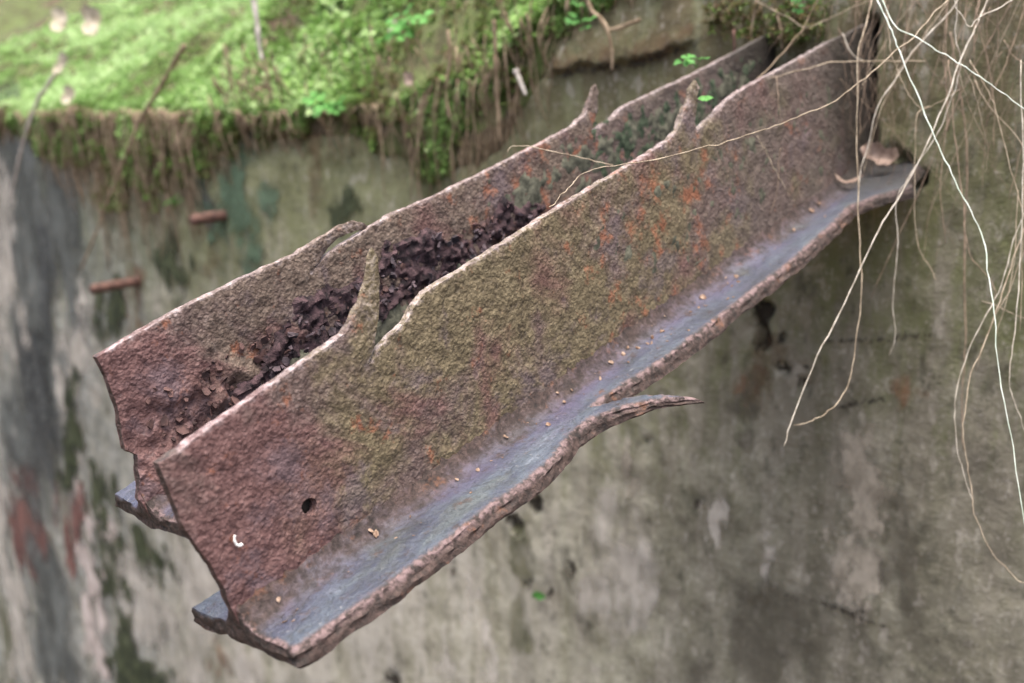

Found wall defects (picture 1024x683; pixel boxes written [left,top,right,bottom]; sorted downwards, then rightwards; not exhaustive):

leakage [0,128,88,518]
corrosion [227,276,363,401]
corrosion [378,196,546,322]
leakage [0,482,109,683]